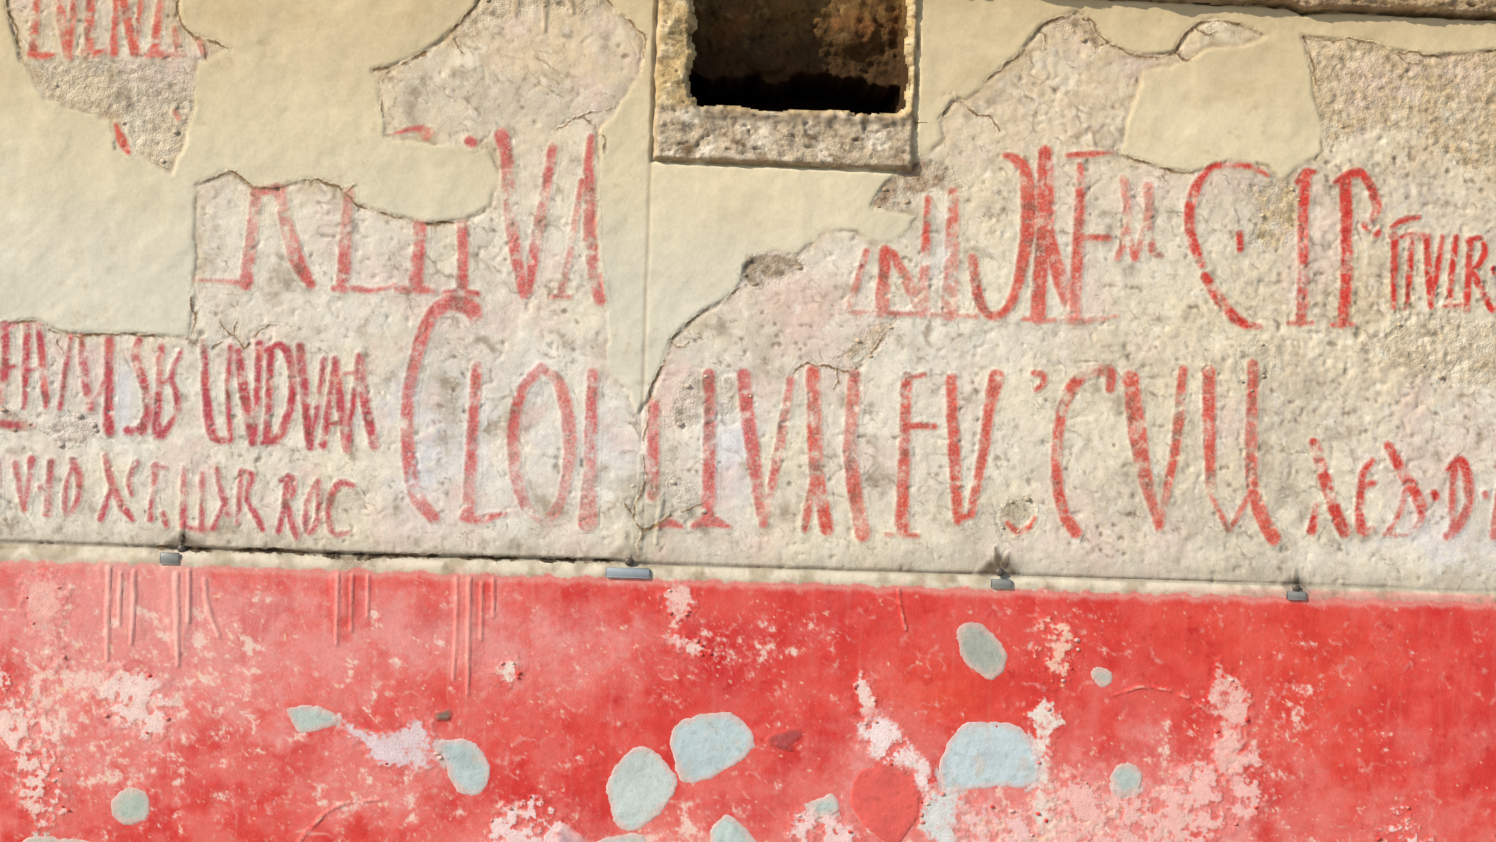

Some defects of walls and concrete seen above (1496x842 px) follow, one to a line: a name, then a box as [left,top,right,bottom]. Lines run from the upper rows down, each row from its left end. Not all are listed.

flaking render [454,0,605,40]
flaking render [30,59,195,169]
flaking render [868,154,970,213]
flaking render [736,251,809,290]
crack [154,285,743,566]
peeling [651,575,717,668]
peeling [0,568,181,841]
peeling [328,706,450,780]
peeling [484,653,529,692]
peeling [846,609,1276,842]
peeling [483,785,593,842]
peeling [781,802,868,842]